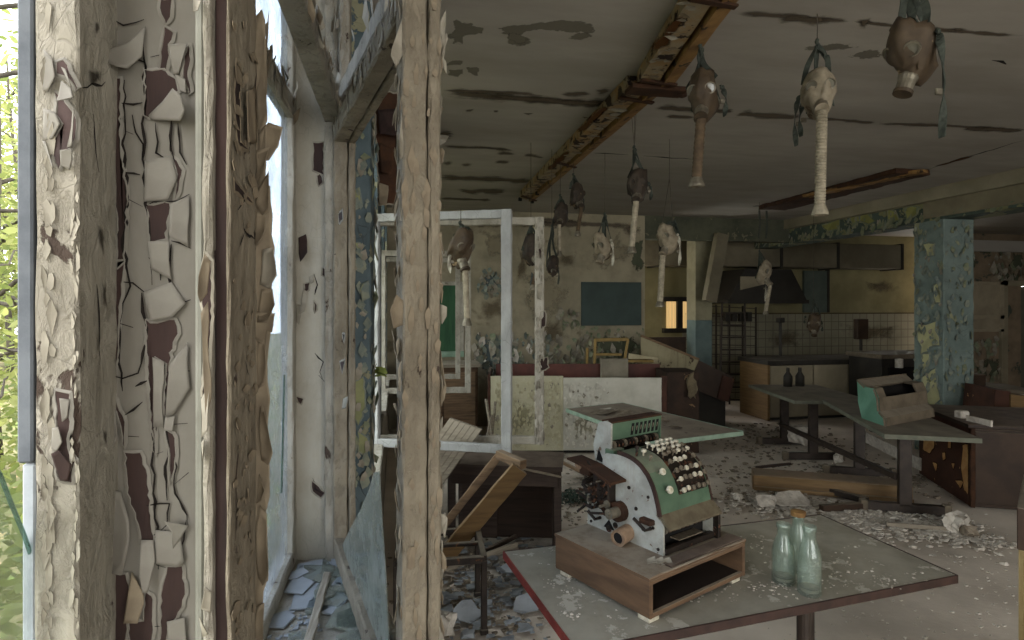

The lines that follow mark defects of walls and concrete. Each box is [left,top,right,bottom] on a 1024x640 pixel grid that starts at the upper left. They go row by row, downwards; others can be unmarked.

peeling [39,49,81,640]
crack [82,19,191,545]
peeling [108,0,194,371]
peeling [112,152,215,640]
peeling [233,9,300,640]
peeling [298,234,307,262]
peeling [308,0,483,512]
water stain [483,302,501,316]
water stain [447,89,609,107]
water stain [499,20,595,46]
water stain [745,12,844,25]
water stain [935,27,1009,36]